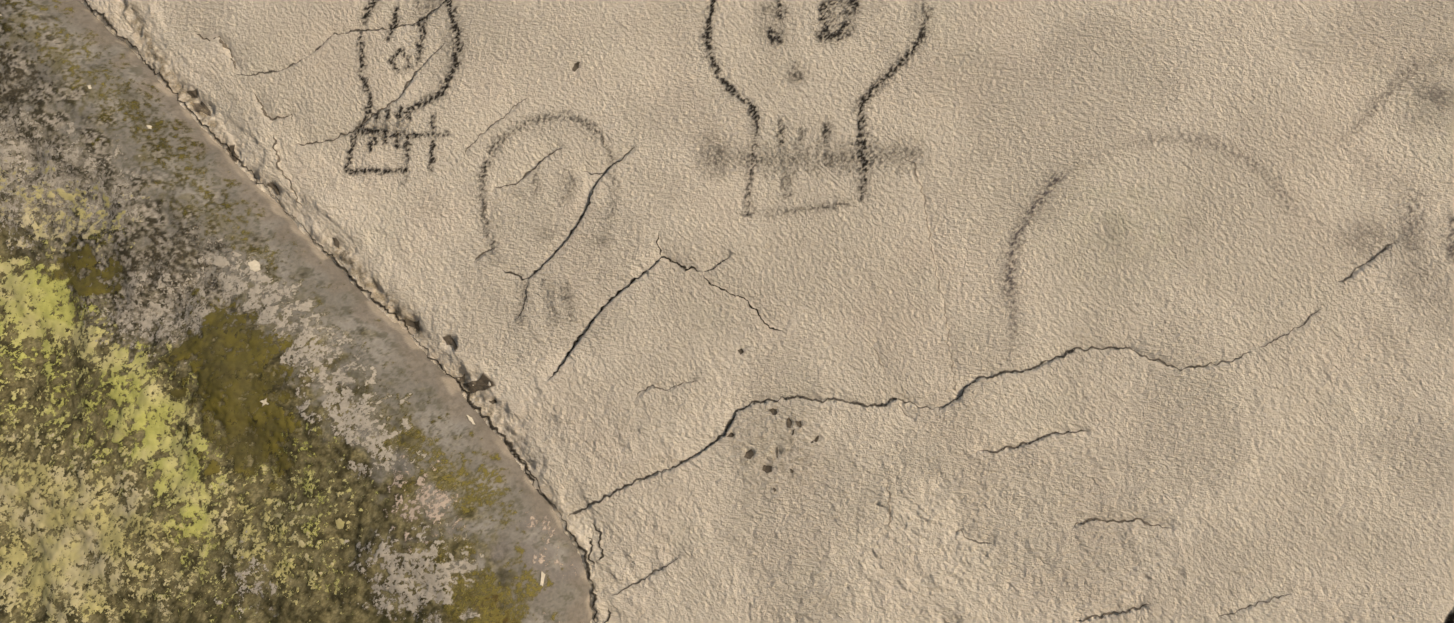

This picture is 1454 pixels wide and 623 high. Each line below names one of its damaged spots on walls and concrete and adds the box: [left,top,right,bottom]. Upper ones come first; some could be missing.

crack [1445,611,1454,623]